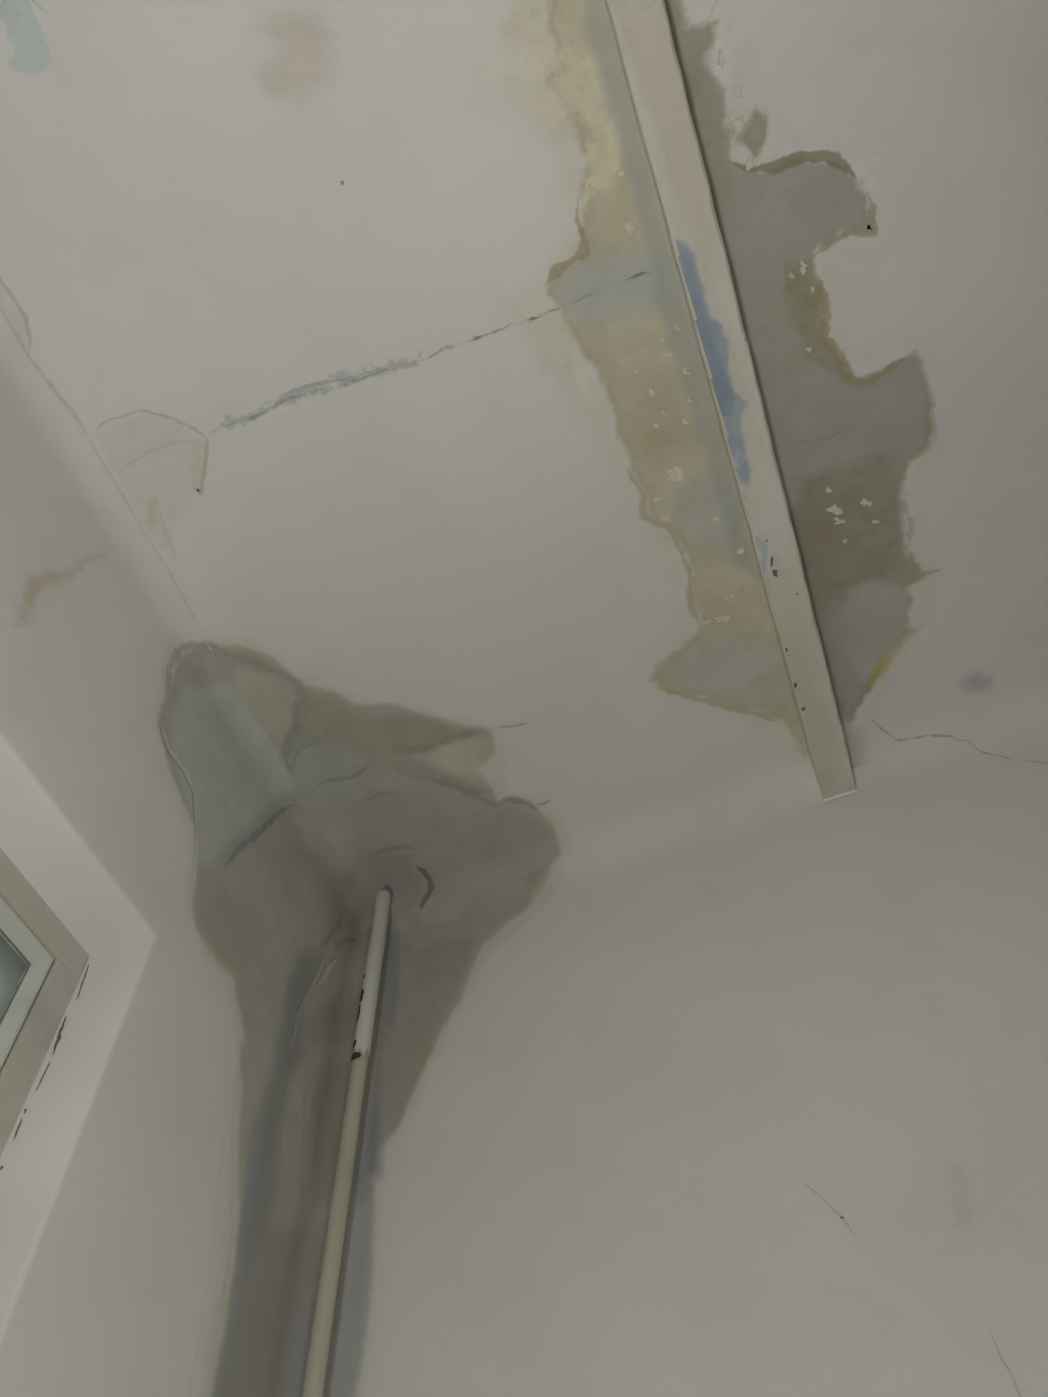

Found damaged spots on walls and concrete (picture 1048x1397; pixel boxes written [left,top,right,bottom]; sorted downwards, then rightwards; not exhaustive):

peeling [610,0,673,200]
crack [204,270,663,442]
leakage [466,0,817,786]
peeling [672,230,774,581]
leakage [664,0,959,769]
crack [863,716,1048,764]
leakage [145,625,582,1397]